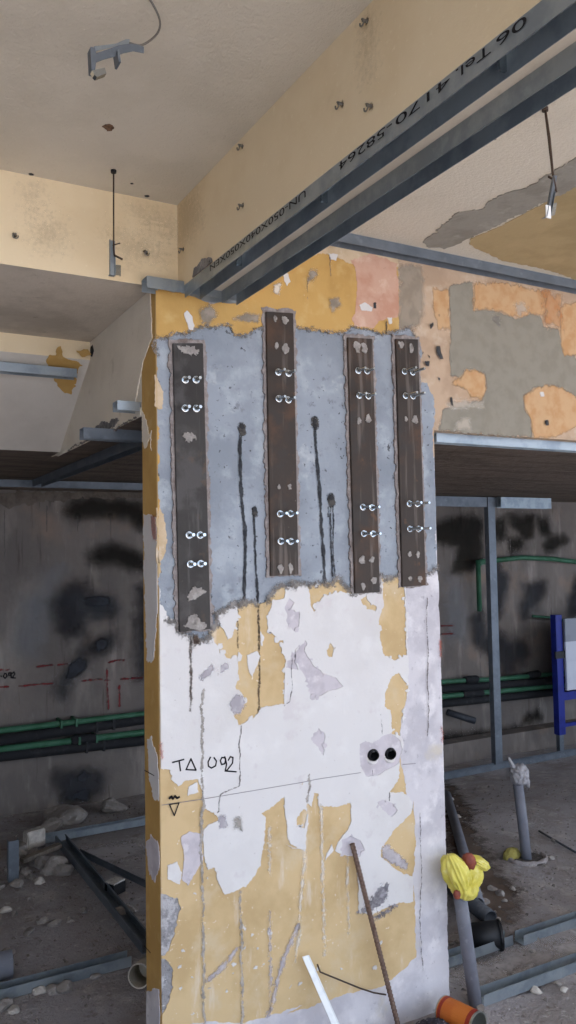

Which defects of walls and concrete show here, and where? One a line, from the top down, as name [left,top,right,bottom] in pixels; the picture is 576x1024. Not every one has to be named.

peeling [423,157,576,280]
peeling [46,345,94,395]
damp [311,416,336,582]
damp [54,583,115,699]
damp [136,587,144,675]
damp [237,423,261,712]
spalling [141,246,576,1024]
damp [472,611,530,675]
damp [497,563,508,615]
damp [521,582,545,617]
crack [199,689,242,1024]
crack [238,890,246,1024]